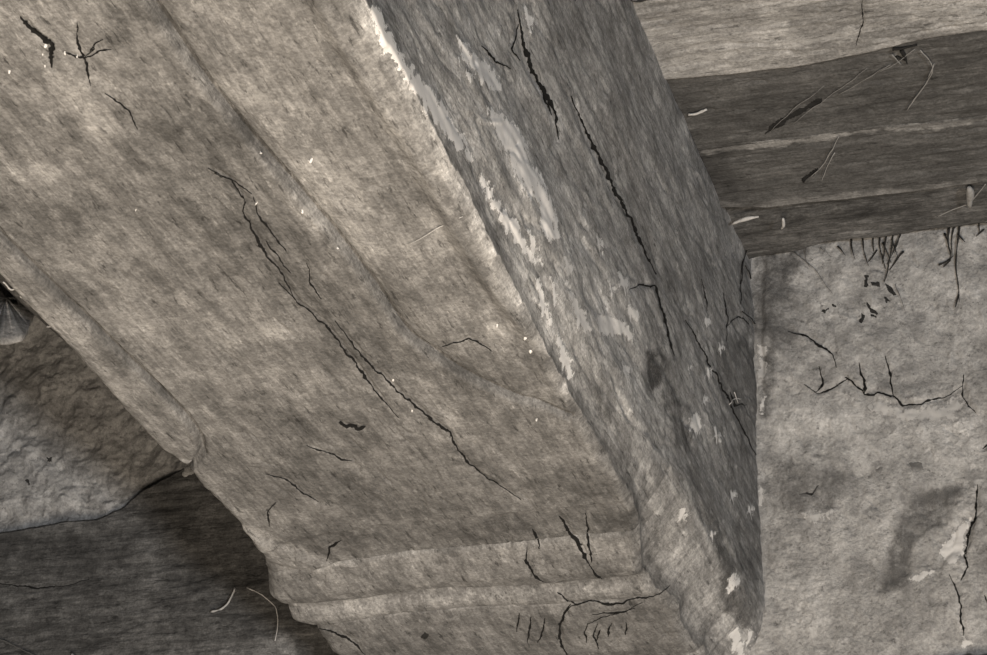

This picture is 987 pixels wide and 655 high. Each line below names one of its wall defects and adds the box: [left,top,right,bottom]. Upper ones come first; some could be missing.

crack [482,9,756,454]
crack [208,168,521,500]
crack [788,331,976,413]
crack [516,513,669,655]
crack [949,484,978,636]